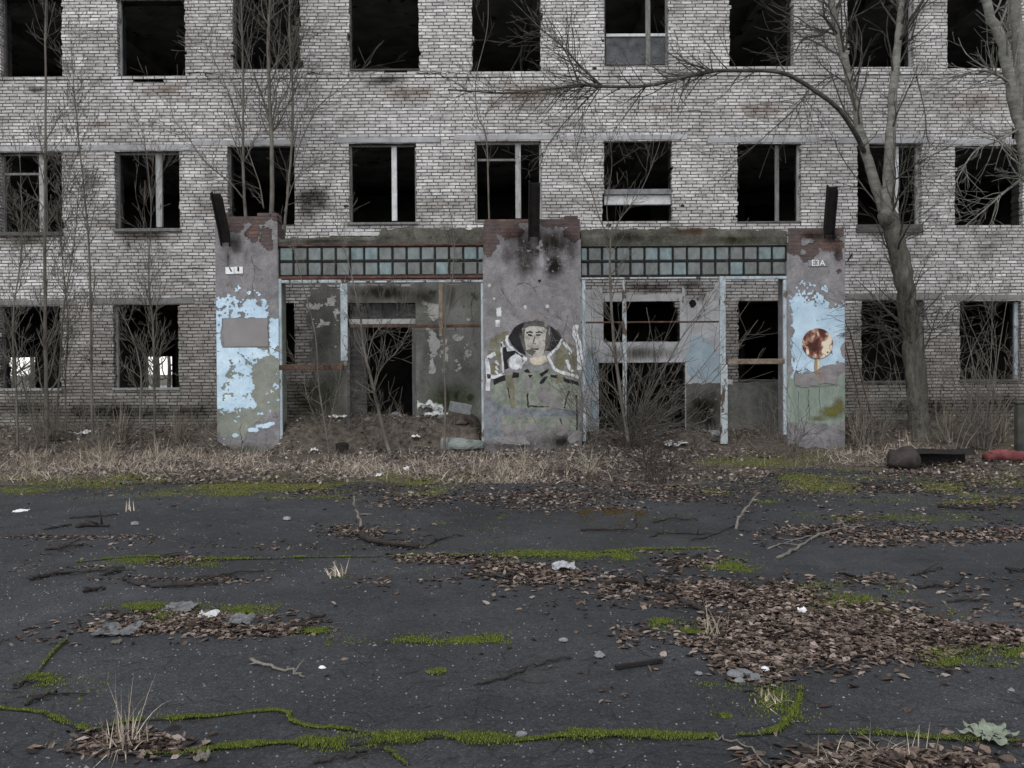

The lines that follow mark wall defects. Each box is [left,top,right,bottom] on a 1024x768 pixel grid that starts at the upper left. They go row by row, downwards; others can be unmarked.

flaking render [227,216,277,251]
flaking render [485,219,580,258]
damp [518,232,567,274]
flaking render [788,228,853,274]
peeling [216,284,279,440]
peeling [421,300,472,374]
peeling [787,280,845,426]